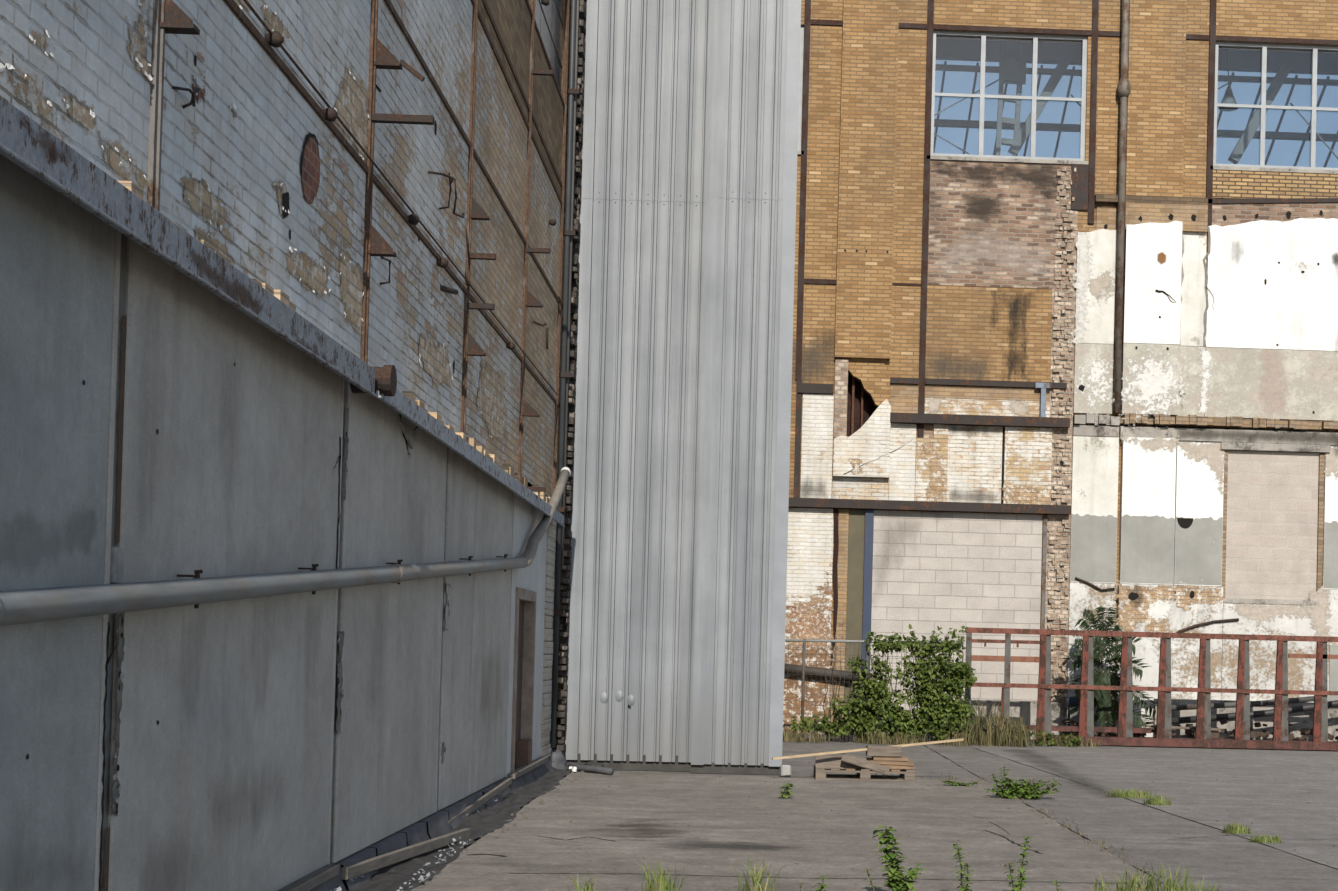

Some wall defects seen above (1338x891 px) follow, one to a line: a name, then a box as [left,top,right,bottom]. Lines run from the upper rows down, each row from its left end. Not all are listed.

peeling [29,30,56,59]
peeling [126,0,153,81]
peeling [234,0,290,43]
peeling [192,54,206,104]
peeling [177,168,237,265]
peeling [271,64,370,336]
corrosion [191,250,263,315]
spalling [835,358,885,408]
spalling [937,163,1232,726]
flaking render [1322,445,1338,478]
flaking render [1115,580,1333,646]
peeling [783,568,849,734]